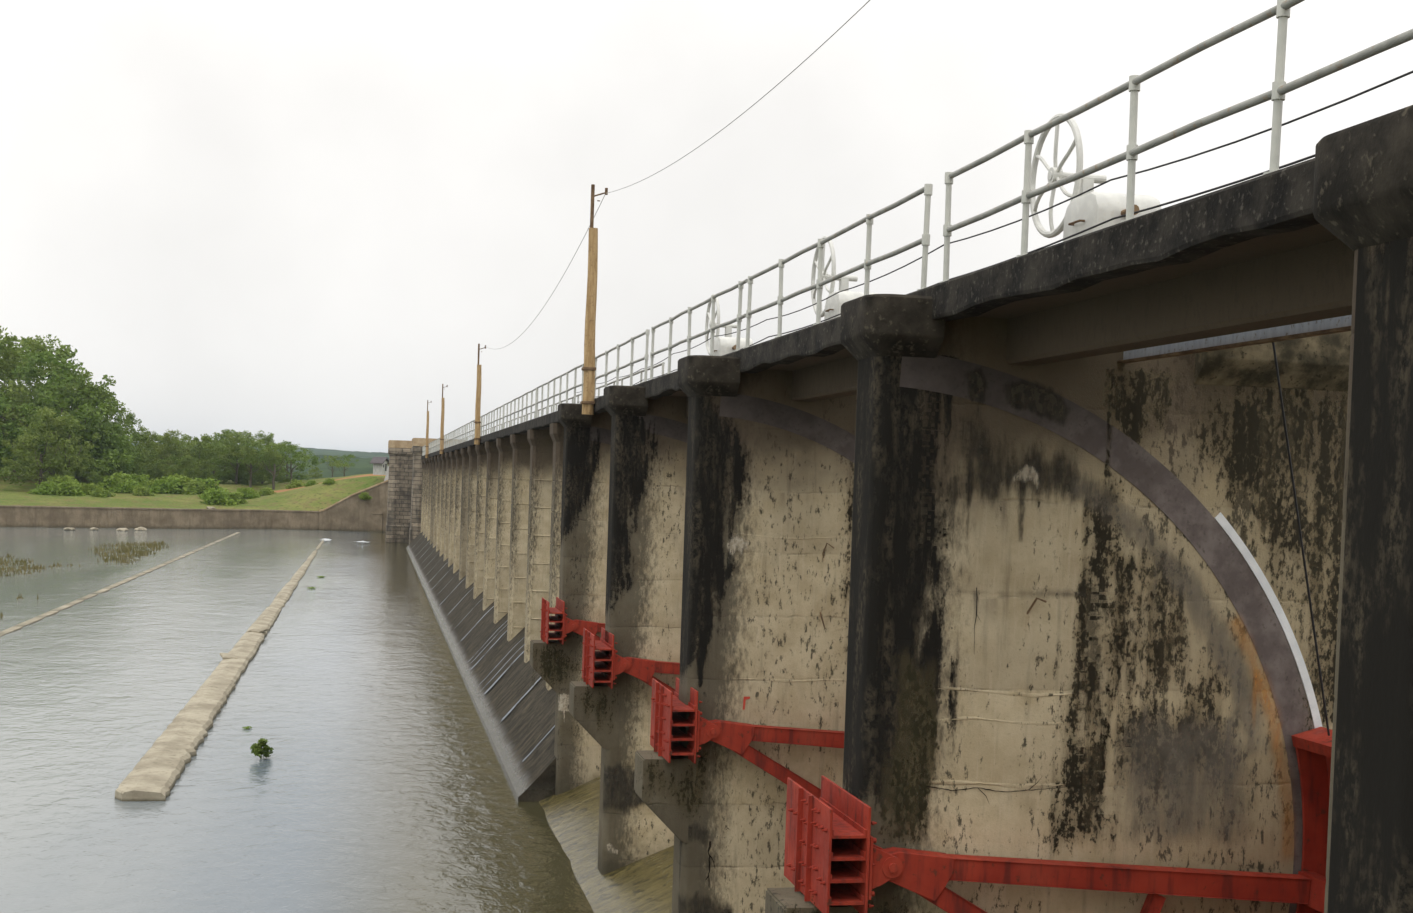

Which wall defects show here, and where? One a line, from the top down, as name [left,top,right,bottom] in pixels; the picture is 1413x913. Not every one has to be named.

damp [839,468,854,621]
damp [943,368,1348,855]